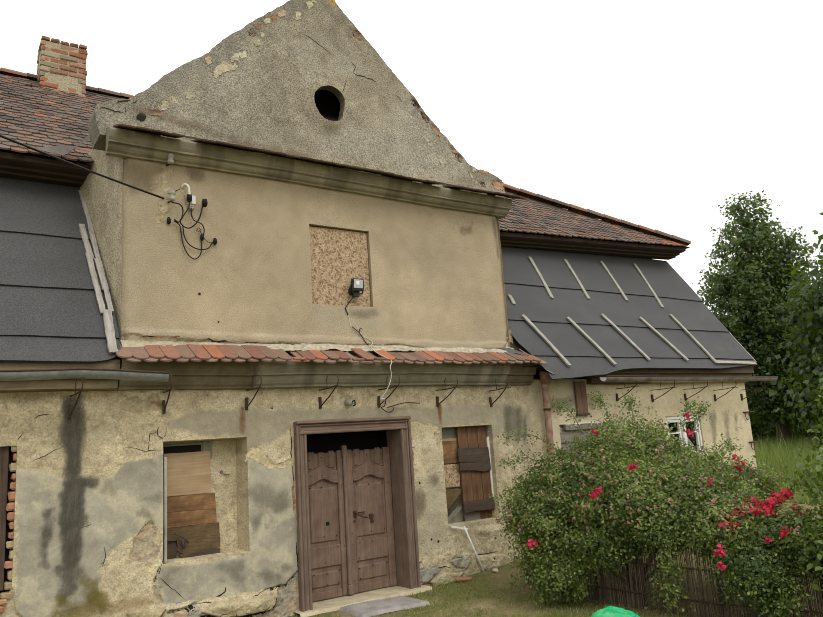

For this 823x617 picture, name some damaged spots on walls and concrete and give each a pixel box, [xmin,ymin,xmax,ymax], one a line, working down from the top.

spalling [247,0,317,46]
spalling [245,446,294,469]
water stain [56,397,98,602]
water stain [42,510,51,563]
spalling [129,521,160,562]